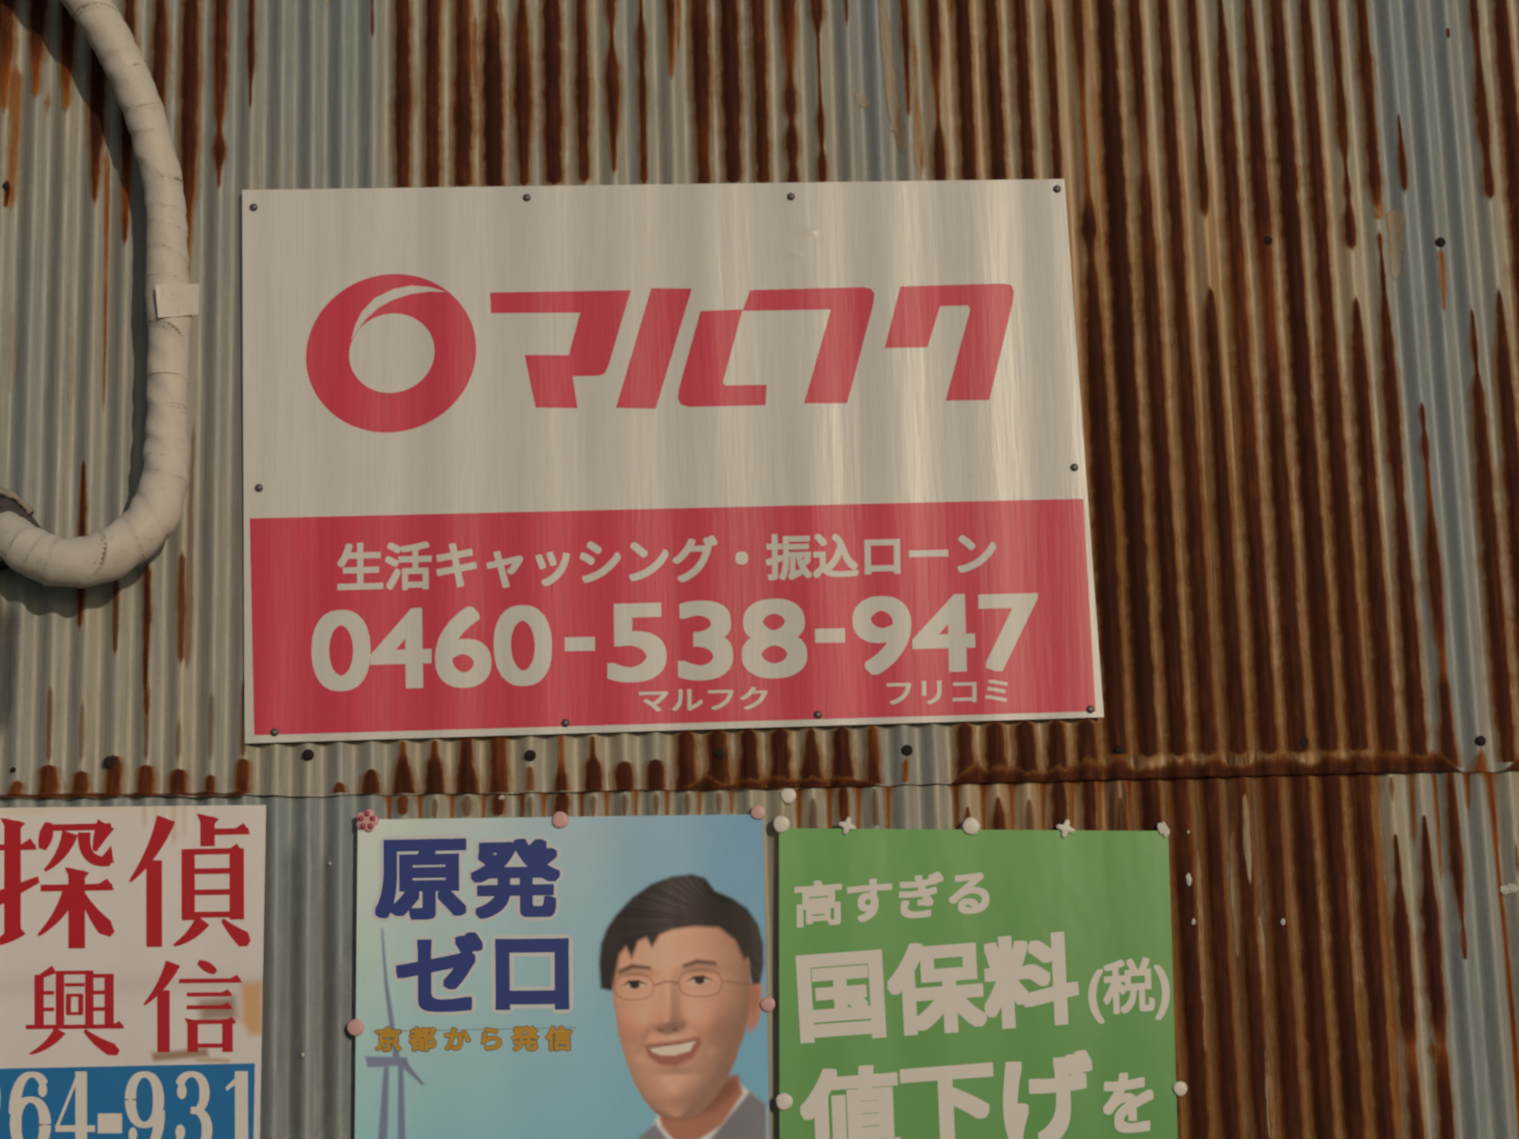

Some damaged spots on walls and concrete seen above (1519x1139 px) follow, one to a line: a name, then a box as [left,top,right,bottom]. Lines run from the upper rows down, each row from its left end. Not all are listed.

corrosion [0,0,133,411]
corrosion [124,0,229,274]
corrosion [247,0,256,107]
corrosion [393,0,648,188]
corrosion [665,0,828,184]
corrosion [79,460,87,536]
corrosion [143,565,152,716]
corrosion [178,553,186,663]
corrosion [900,0,1519,1139]
corrosion [0,680,251,799]
corrosion [333,725,909,829]